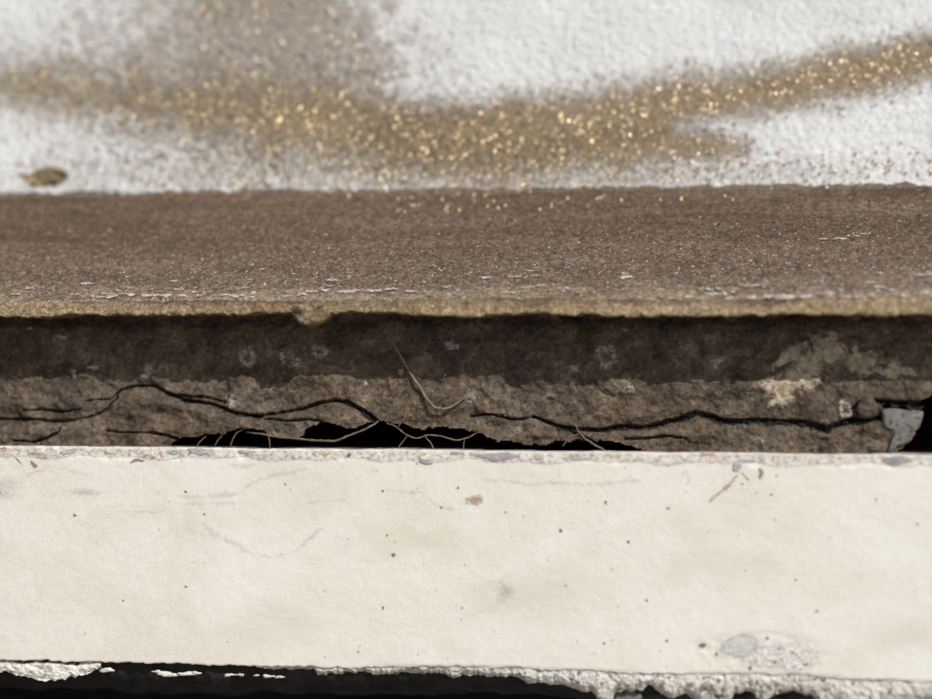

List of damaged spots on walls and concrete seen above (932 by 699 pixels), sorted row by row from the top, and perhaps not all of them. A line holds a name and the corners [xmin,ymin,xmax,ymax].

crack [0,385,376,468]
crack [484,399,926,445]
hole [882,395,932,450]
peeling [0,660,115,682]
spalling [224,634,932,699]